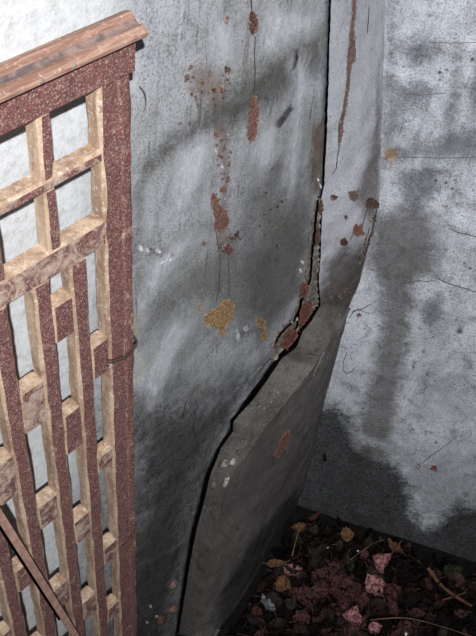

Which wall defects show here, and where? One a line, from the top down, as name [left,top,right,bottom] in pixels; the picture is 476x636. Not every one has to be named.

crack [251,36,259,94]
water stain [133,323,188,404]
water stain [134,374,250,636]
crack [216,232,230,302]
crack [271,115,342,362]
water stain [211,170,476,634]